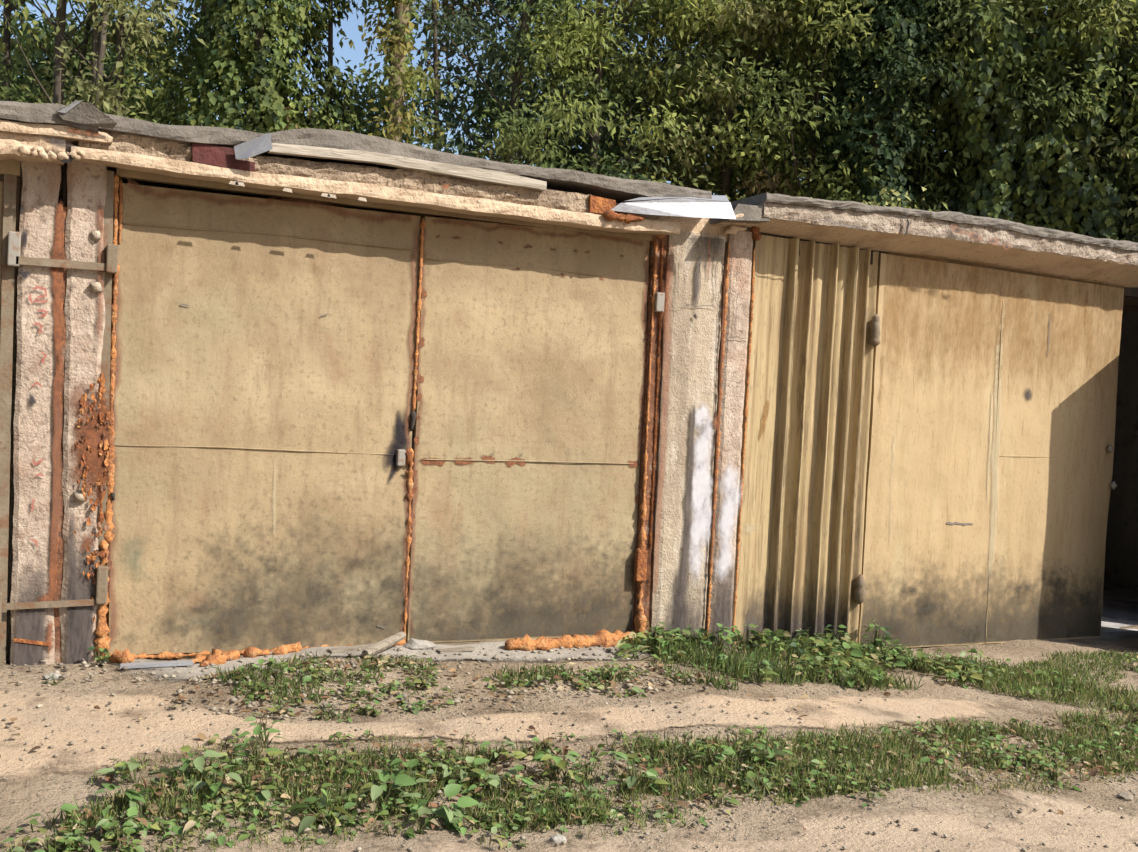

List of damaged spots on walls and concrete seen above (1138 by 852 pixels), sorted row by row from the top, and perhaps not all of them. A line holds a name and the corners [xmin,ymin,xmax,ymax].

corrosion [39,202,121,638]
corrosion [402,219,649,631]
damp [419,577,634,641]
corrosion [654,247,674,592]
damp [692,235,723,305]
damp [667,315,1102,650]